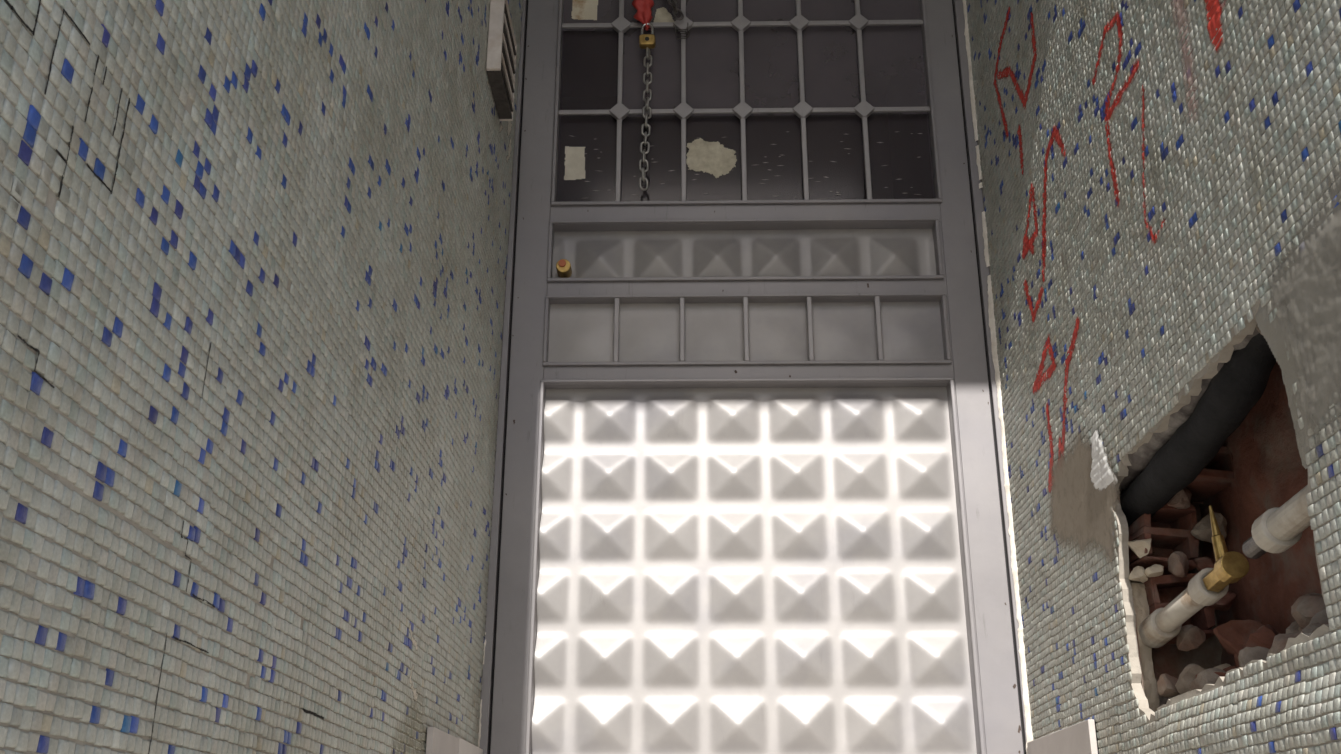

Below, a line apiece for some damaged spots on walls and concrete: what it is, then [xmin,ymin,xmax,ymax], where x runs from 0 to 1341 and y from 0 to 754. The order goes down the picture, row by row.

crack [5,0,130,198]
spalling [1128,361,1329,712]